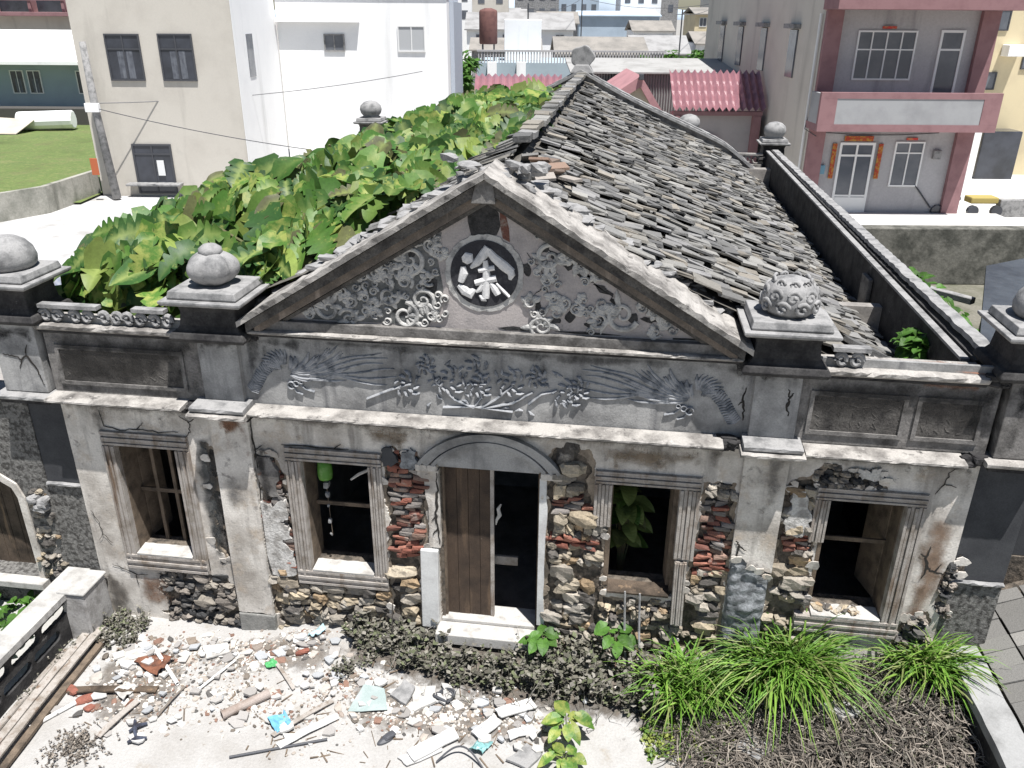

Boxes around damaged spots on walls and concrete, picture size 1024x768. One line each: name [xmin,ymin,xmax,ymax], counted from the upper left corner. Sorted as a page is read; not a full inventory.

crack [4,345,45,385]
crack [98,410,194,436]
spalling [26,488,70,578]
spalling [255,446,432,631]
spalling [540,442,739,659]
spalling [760,463,895,643]
spalling [886,555,971,666]
crack [920,546,946,579]